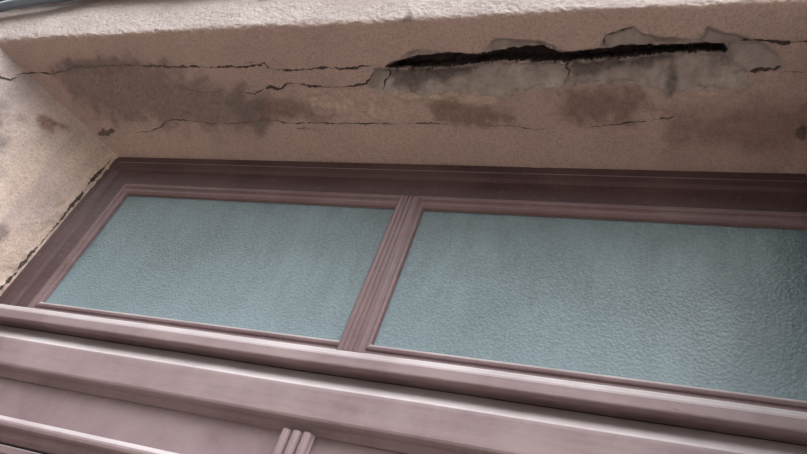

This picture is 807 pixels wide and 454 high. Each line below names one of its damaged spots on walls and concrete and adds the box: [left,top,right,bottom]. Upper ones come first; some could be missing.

crack [0,62,454,133]
flaking render [365,27,783,100]
crack [587,115,675,128]
crack [745,37,807,45]